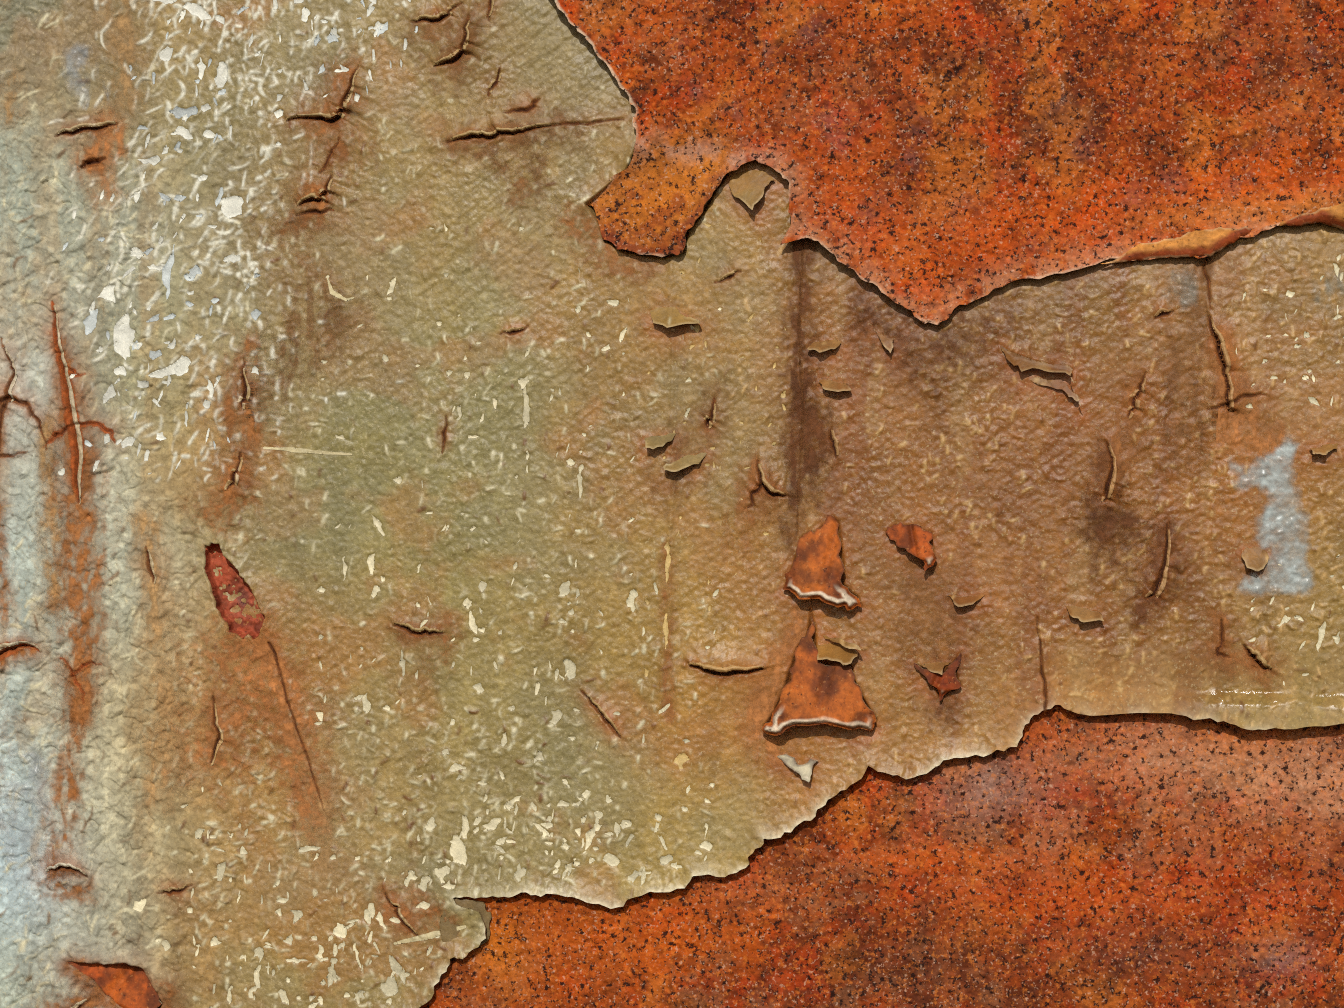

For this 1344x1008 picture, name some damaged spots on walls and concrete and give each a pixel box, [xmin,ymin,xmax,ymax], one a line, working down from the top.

crack [285,70,358,216]
crack [412,0,494,67]
crack [447,68,624,143]
peeling [554,0,1344,325]
crack [0,301,115,504]
corrosion [0,505,9,619]
corrosion [39,340,104,901]
peeling [762,616,876,736]
peeling [783,515,862,611]
corrosion [382,890,455,933]
spalling [187,749,683,1008]
corrosion [419,705,1344,1008]